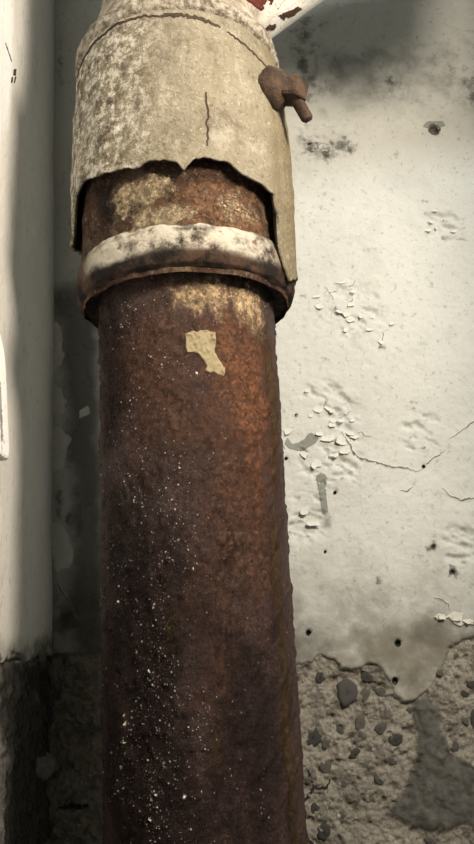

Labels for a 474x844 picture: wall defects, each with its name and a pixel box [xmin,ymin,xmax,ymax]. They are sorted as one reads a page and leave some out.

peeling [312,280,395,348]
peeling [283,397,372,526]
crack [341,421,474,492]
crack [442,488,474,502]
peeling [434,611,474,627]
leakage [0,660,53,844]
spalling [0,652,104,844]
spalling [296,638,474,844]